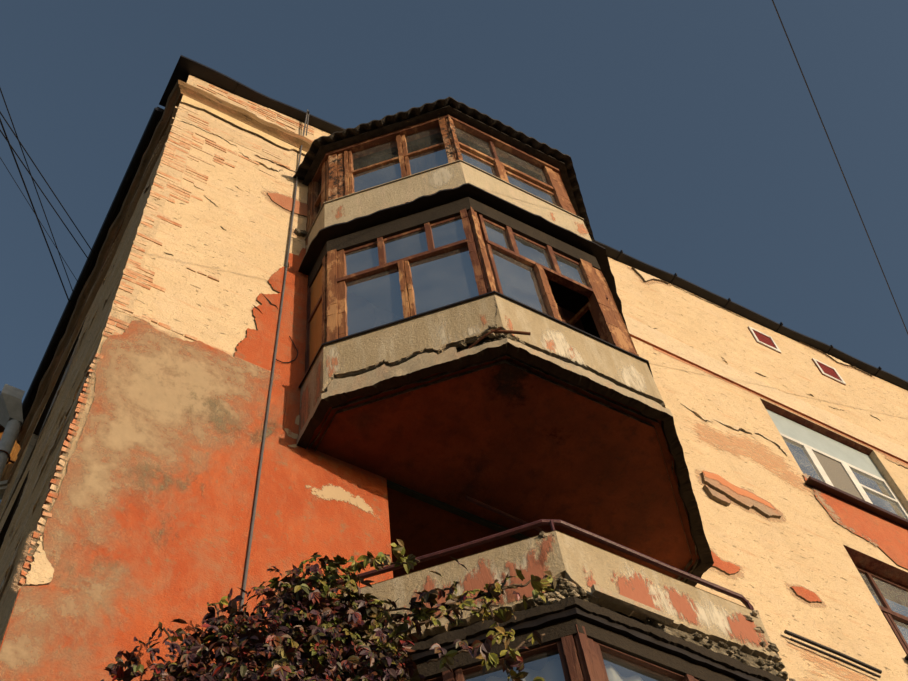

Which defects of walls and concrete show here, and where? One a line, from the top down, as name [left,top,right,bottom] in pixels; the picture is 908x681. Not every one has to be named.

crack [182,106,281,172]
spalling [101,105,296,356]
peeling [262,191,308,218]
crack [342,299,497,376]
crack [530,347,644,397]
crack [680,403,787,456]
spalling [13,353,103,592]
peeling [306,483,379,519]
peeling [684,419,879,547]
peeling [711,550,743,579]
peeling [785,583,825,607]
spalling [644,610,872,681]